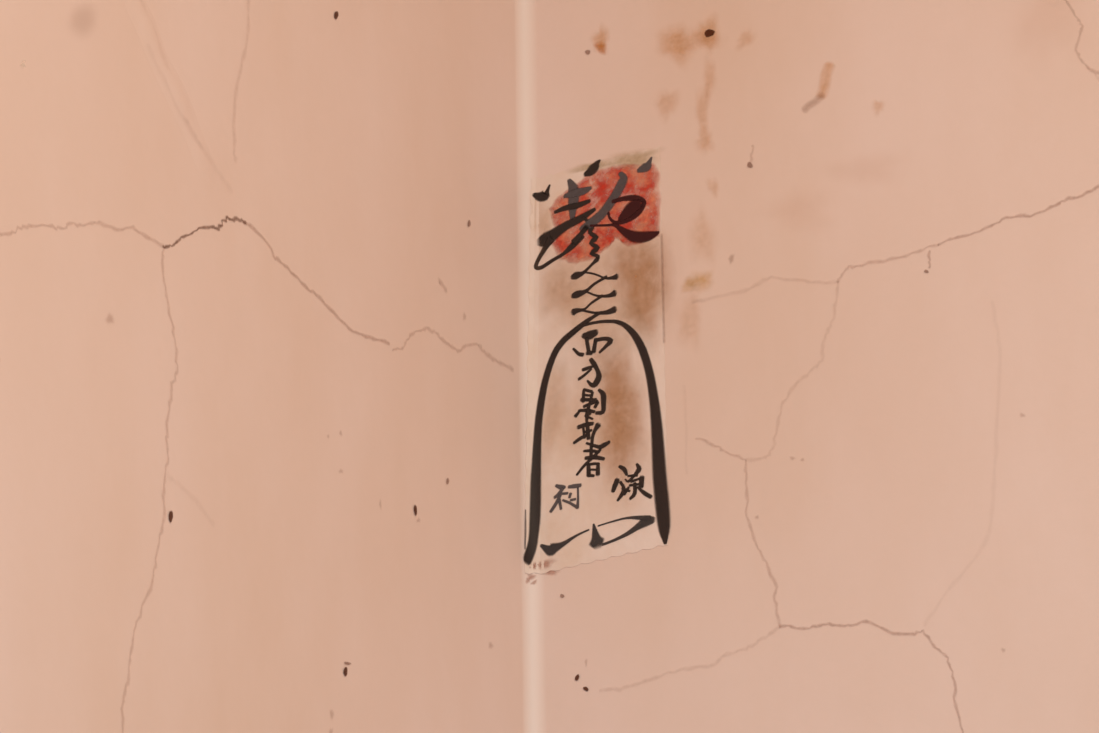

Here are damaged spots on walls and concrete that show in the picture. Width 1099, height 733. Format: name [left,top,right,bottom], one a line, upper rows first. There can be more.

crack [164,216,246,248]